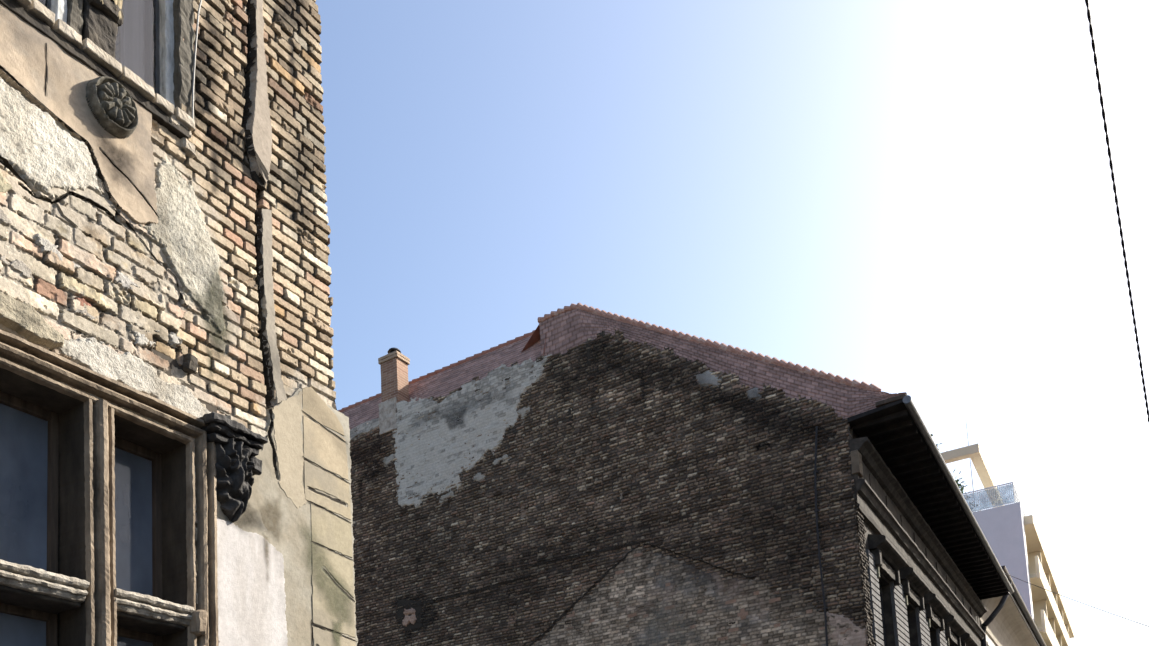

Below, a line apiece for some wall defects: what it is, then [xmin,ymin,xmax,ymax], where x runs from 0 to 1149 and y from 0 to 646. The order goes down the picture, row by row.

peeling [0,3,158,226]
peeling [34,233,86,271]
peeling [0,255,34,280]
peeling [71,297,99,321]
peeling [126,325,182,349]